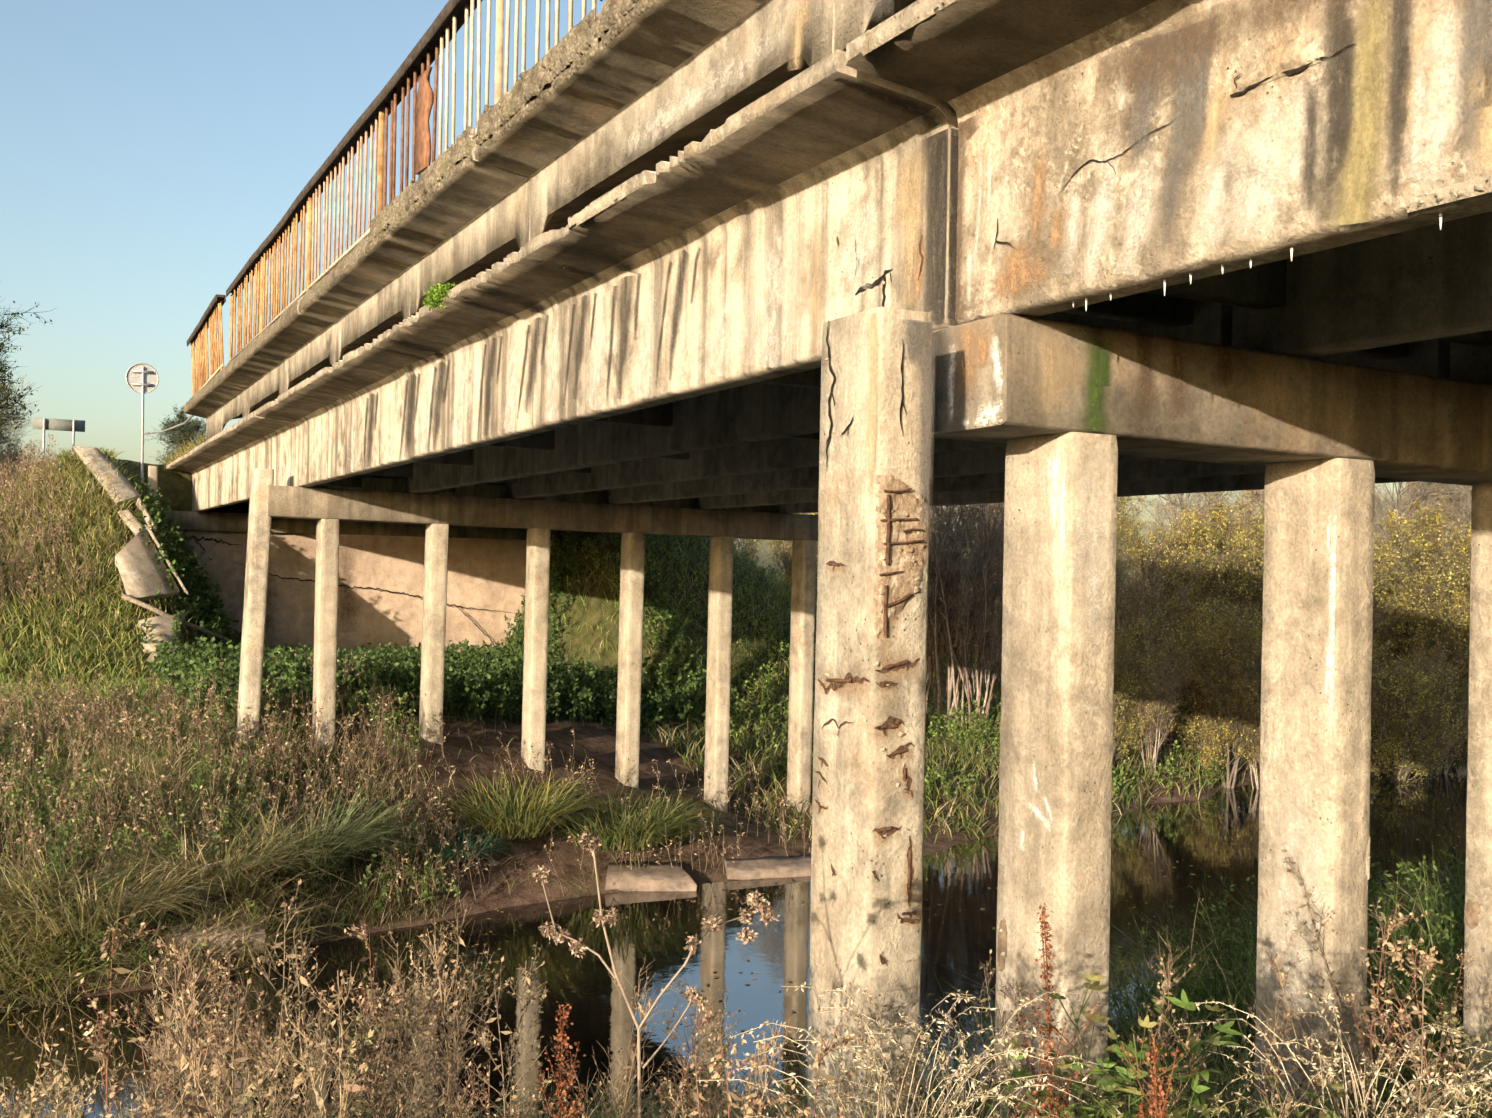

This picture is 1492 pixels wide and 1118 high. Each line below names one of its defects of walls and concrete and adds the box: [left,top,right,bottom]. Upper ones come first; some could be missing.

water stain [352,243,699,468]
water stain [756,239,788,361]
crack [826,320,854,467]
crack [854,238,893,307]
crack [899,339,907,433]
corrosion [999,163,1060,297]
water stain [1069,155,1114,267]
crack [1061,121,1173,191]
water stain [1099,21,1211,262]
crack [1230,43,1358,97]
water stain [1206,0,1492,236]
spalling [874,473,928,638]